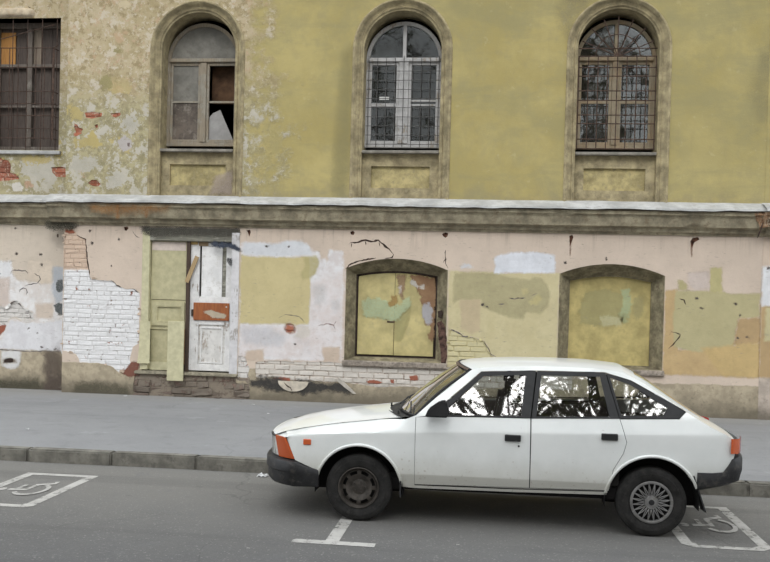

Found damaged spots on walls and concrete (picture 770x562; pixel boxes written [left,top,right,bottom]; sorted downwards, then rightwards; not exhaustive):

peeling [0,106,140,192]
crack [347,239,394,268]
crack [10,269,41,305]
spalling [0,301,38,335]
spalling [54,228,494,399]
spalling [461,371,519,391]
spalling [536,371,572,390]